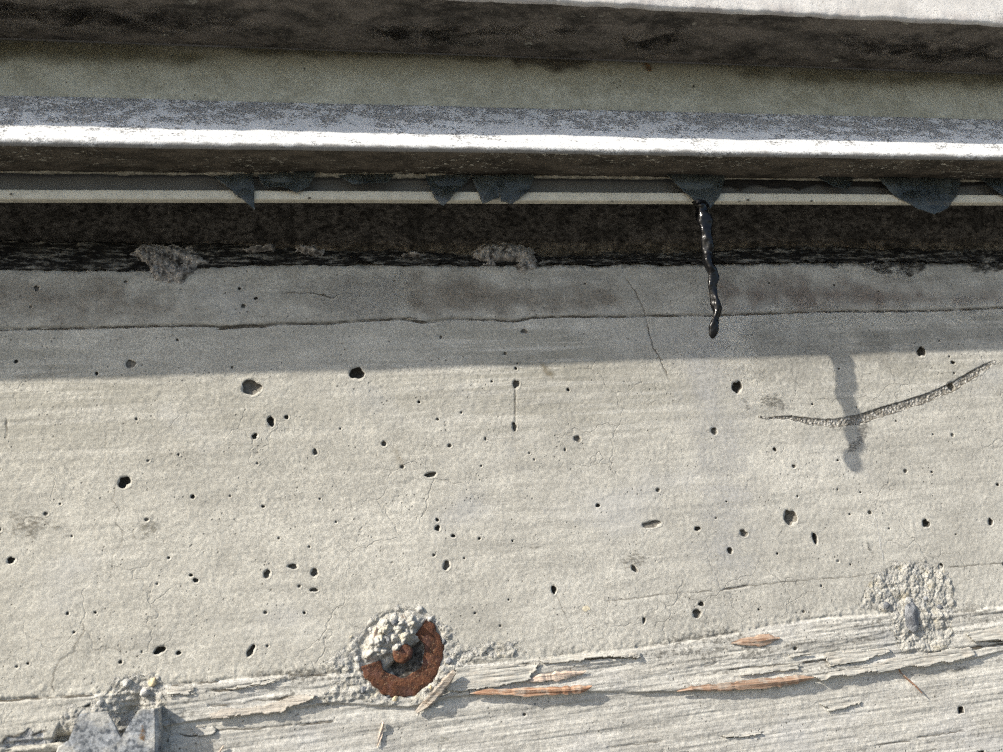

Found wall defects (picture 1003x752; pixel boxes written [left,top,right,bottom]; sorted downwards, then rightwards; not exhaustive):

damp [48,8,129,26]
crack [703,307,1003,317]
crack [0,317,427,331]
crack [469,290,679,372]
spalling [814,558,1003,681]
spalling [191,604,642,736]
peeling [739,653,811,676]
spalling [2,672,195,752]
peeling [819,699,862,711]